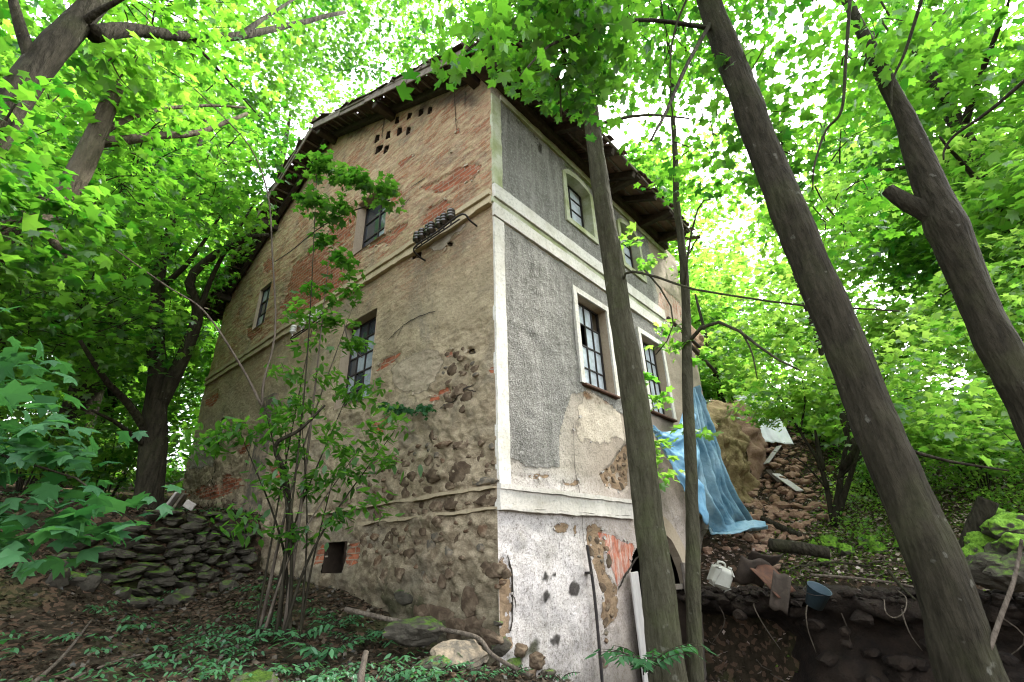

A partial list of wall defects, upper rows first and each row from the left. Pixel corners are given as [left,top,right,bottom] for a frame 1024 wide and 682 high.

flaking render [361,163,481,252]
peeling [375,346,494,413]
peeling [572,392,628,493]
flaking render [314,545,328,565]
spalling [345,429,556,681]
crack [507,555,517,631]
water stain [569,581,580,596]
peeling [553,523,634,669]